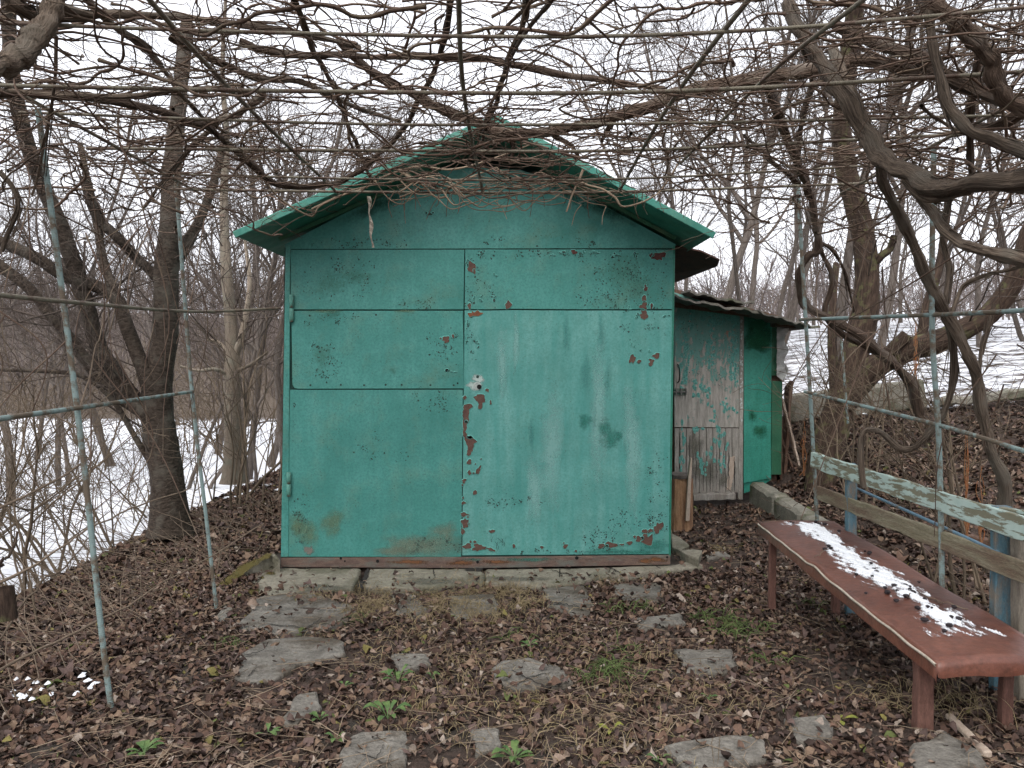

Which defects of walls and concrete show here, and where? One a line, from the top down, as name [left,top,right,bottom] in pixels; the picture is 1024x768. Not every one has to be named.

peeling [408,236,743,555]